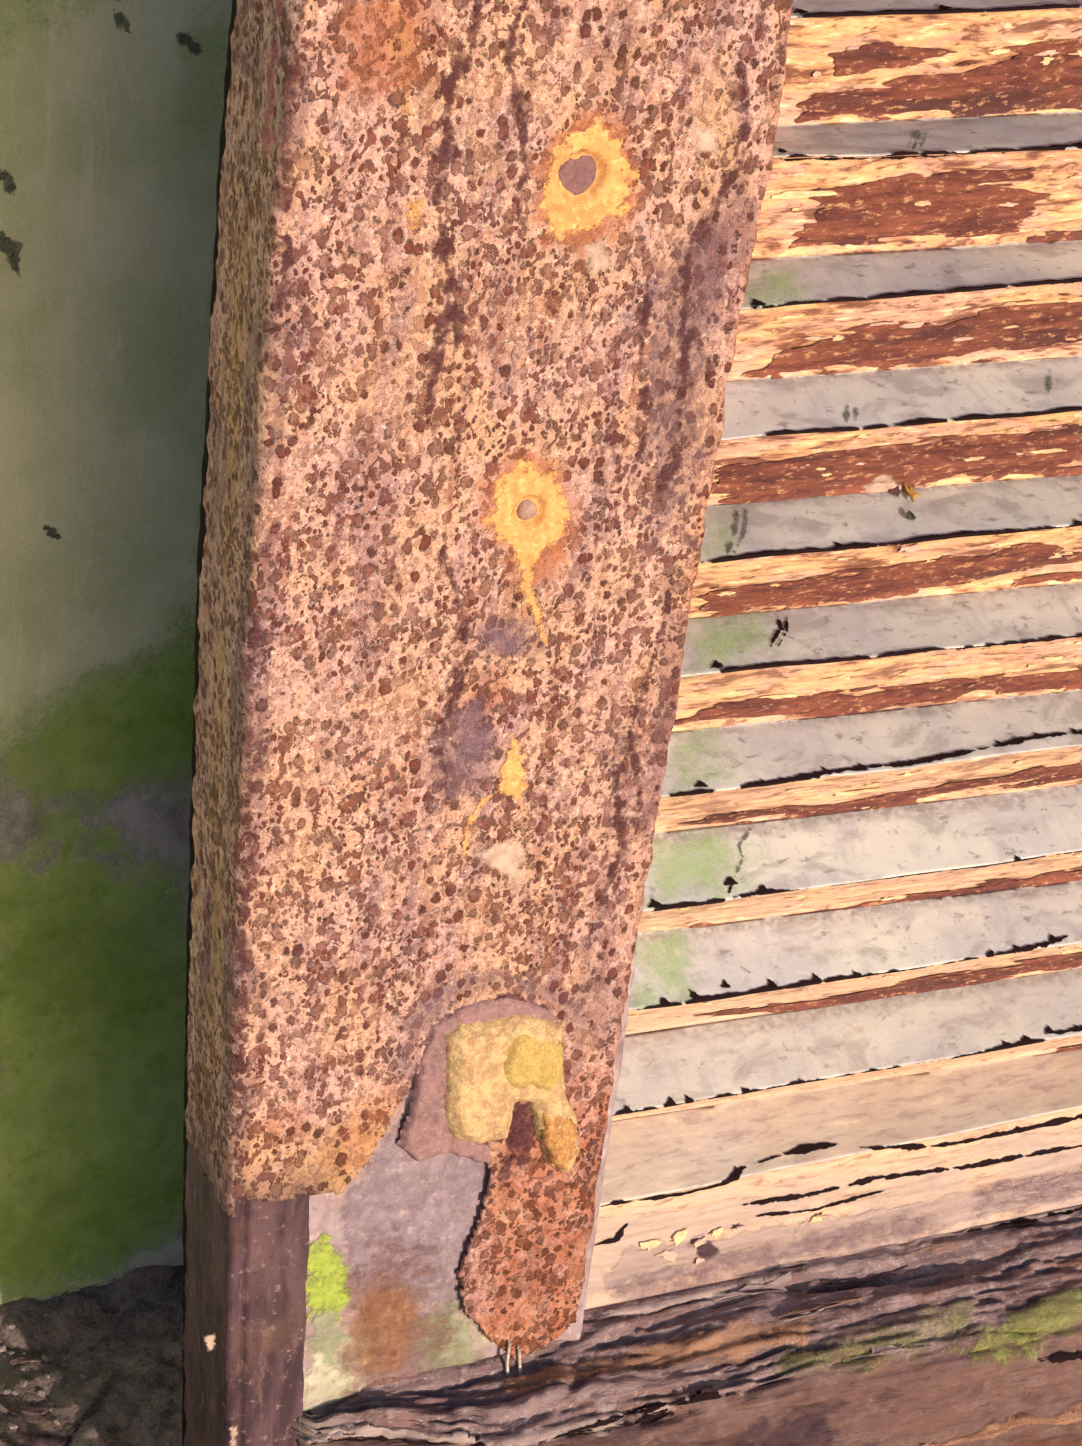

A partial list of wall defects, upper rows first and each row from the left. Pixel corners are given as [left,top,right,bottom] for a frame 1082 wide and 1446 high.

peeling [795,29,1082,124]
peeling [771,168,1082,250]
peeling [742,293,1082,379]
peeling [711,424,1082,521]
peeling [697,543,1082,617]
corrosion [185,0,808,1399]
leakage [0,768,191,915]
crack [613,1025,1082,1116]
crack [594,1114,1082,1246]
leakage [96,1236,183,1286]
crack [309,1435,436,1446]
crack [530,1389,740,1446]